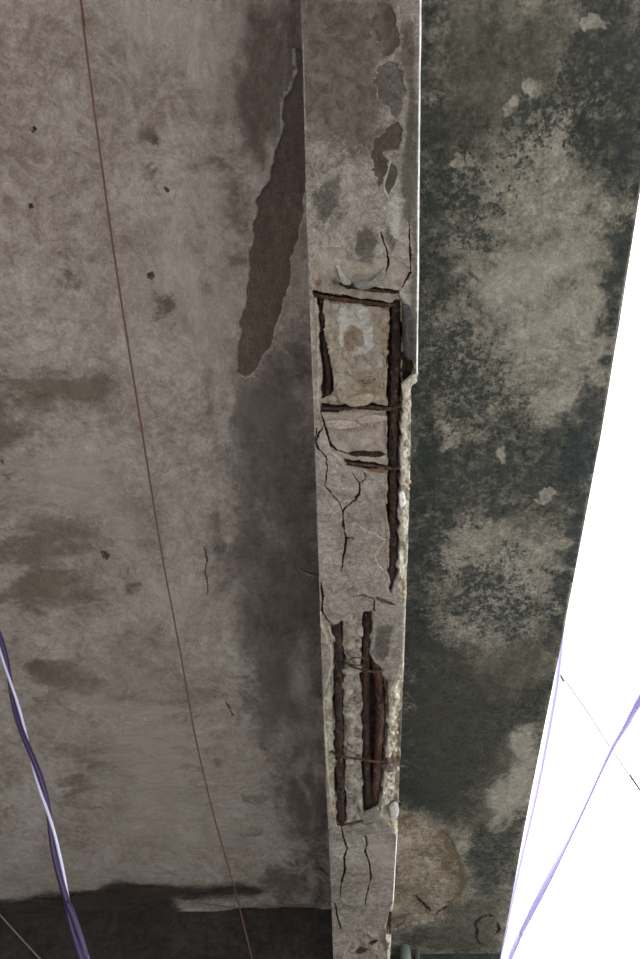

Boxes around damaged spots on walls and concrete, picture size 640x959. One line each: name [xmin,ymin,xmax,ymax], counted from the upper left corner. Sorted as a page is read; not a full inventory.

peeling [370,2,407,197]
peeling [234,48,306,378]
rust [316,278,389,309]
crack [380,221,412,288]
peeling [479,205,603,354]
damp [215,348,326,841]
crack [315,410,366,570]
rust [367,461,389,581]
spalling [308,247,466,959]
damp [387,0,640,950]
crack [334,826,372,929]